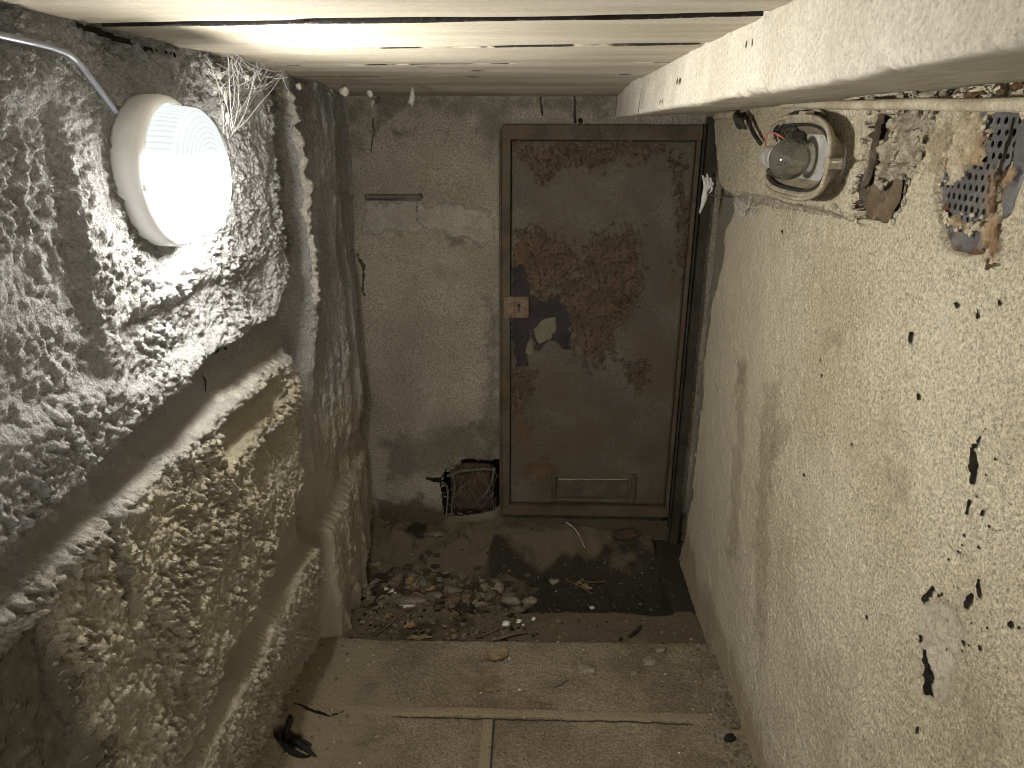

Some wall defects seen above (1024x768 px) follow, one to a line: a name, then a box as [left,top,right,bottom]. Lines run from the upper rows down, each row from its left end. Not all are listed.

spalling [734,82,1024,225]
corrosion [513,140,690,281]
flaking render [943,209,985,238]
spalling [440,457,500,516]
spalling [918,606,965,701]